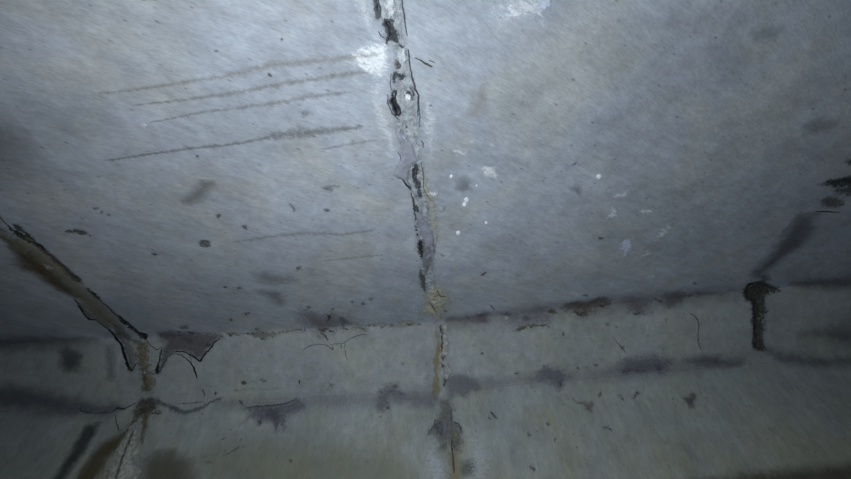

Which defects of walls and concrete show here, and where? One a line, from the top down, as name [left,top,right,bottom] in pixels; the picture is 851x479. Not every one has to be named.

crack [387,3,462,144]
crack [398,153,432,221]
crack [74,299,136,371]
crack [146,339,205,396]
peeling [155,307,417,374]
crack [113,403,135,430]